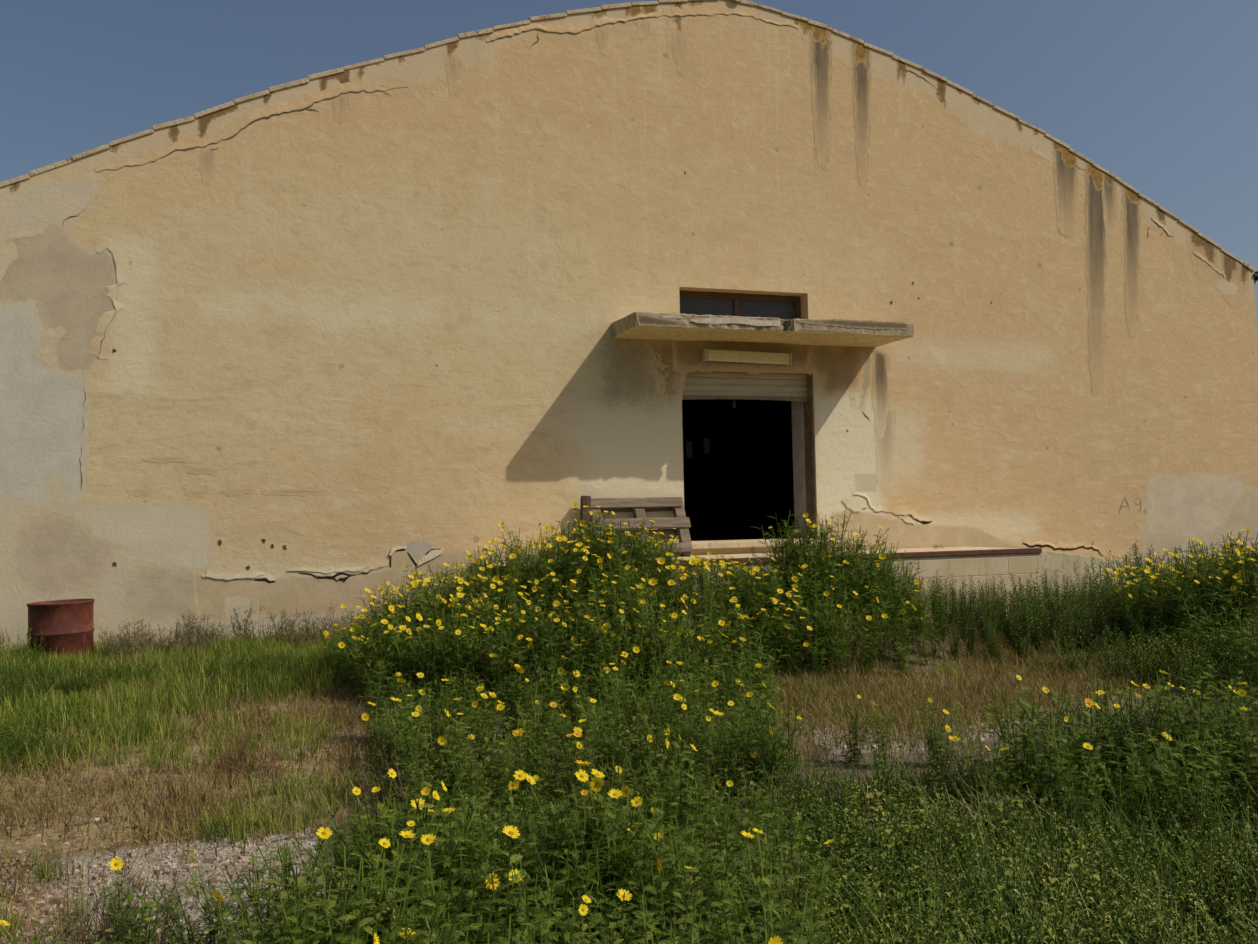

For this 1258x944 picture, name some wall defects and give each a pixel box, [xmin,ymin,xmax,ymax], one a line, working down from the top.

crack [484,5,800,45]
water stain [809,29,833,168]
water stain [851,40,872,186]
crack [63,77,407,224]
water stain [1053,141,1142,397]
crack [79,237,129,487]
crack [852,491,932,524]
peeling [205,565,262,580]
peeling [288,566,368,574]
peeling [389,541,444,570]
crack [1022,538,1105,556]